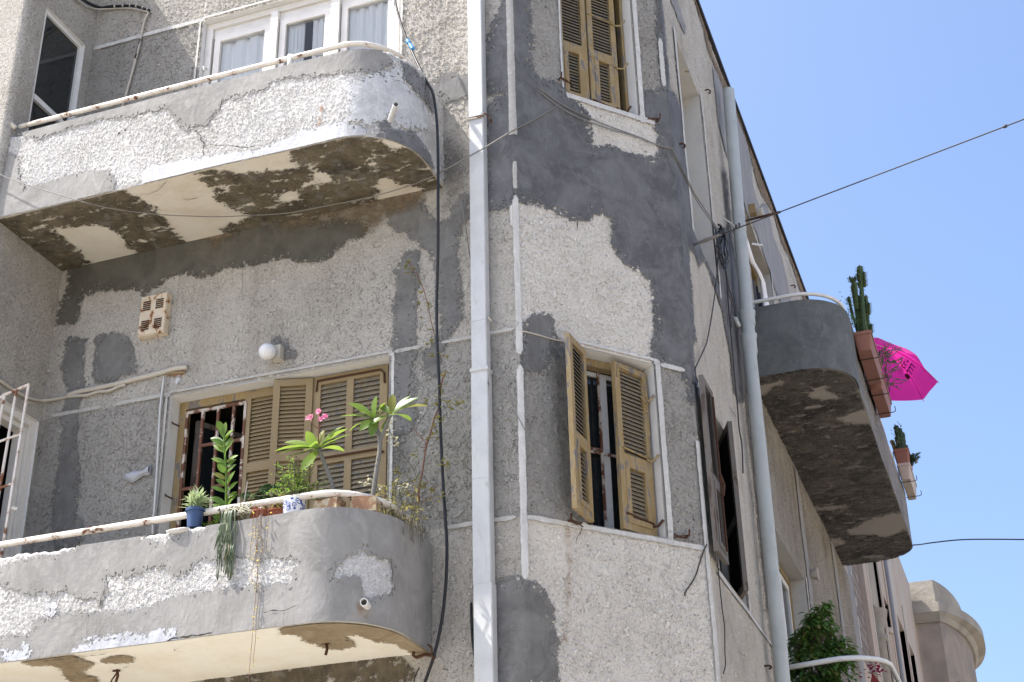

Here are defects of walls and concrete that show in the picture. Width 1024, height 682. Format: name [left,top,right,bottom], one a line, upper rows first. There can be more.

flaking render [140,66,442,233]
flaking render [0,191,185,271]
flaking render [759,370,912,574]
peeling [0,627,183,682]
flaking render [204,623,428,682]